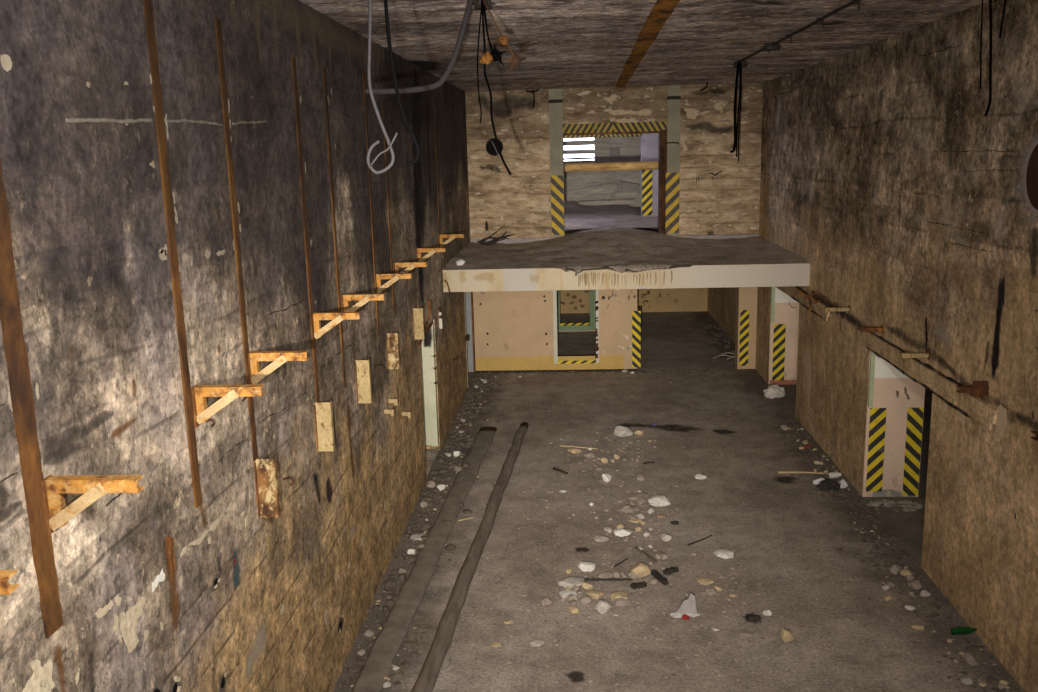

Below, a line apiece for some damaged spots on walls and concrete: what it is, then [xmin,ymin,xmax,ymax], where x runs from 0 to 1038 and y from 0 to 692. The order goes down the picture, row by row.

spalling [561,264,693,276]